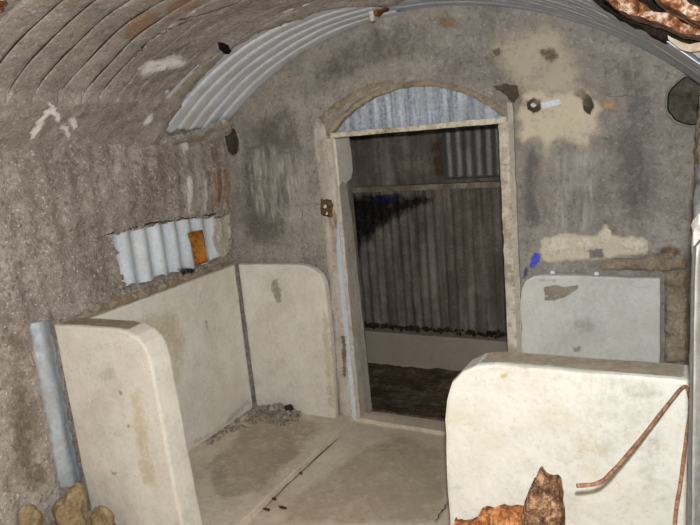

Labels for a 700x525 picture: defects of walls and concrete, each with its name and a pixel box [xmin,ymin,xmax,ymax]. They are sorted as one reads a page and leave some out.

rust [593,0,700,54]
peeling [490,23,615,153]
water stain [249,123,306,239]
spalling [70,210,234,319]
spalling [544,285,578,301]
peeling [538,224,649,263]